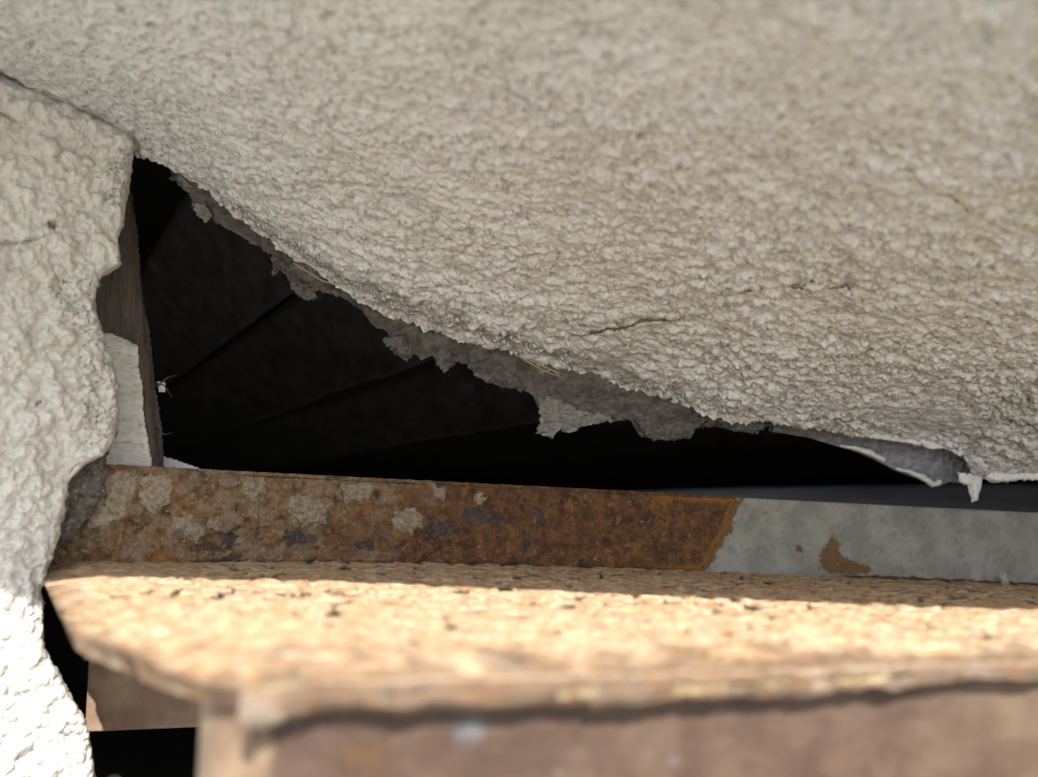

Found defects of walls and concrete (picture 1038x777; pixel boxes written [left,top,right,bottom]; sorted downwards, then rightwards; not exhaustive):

spalling [168,167,1038,502]
rust [49,464,744,571]
rust [820,538,871,576]